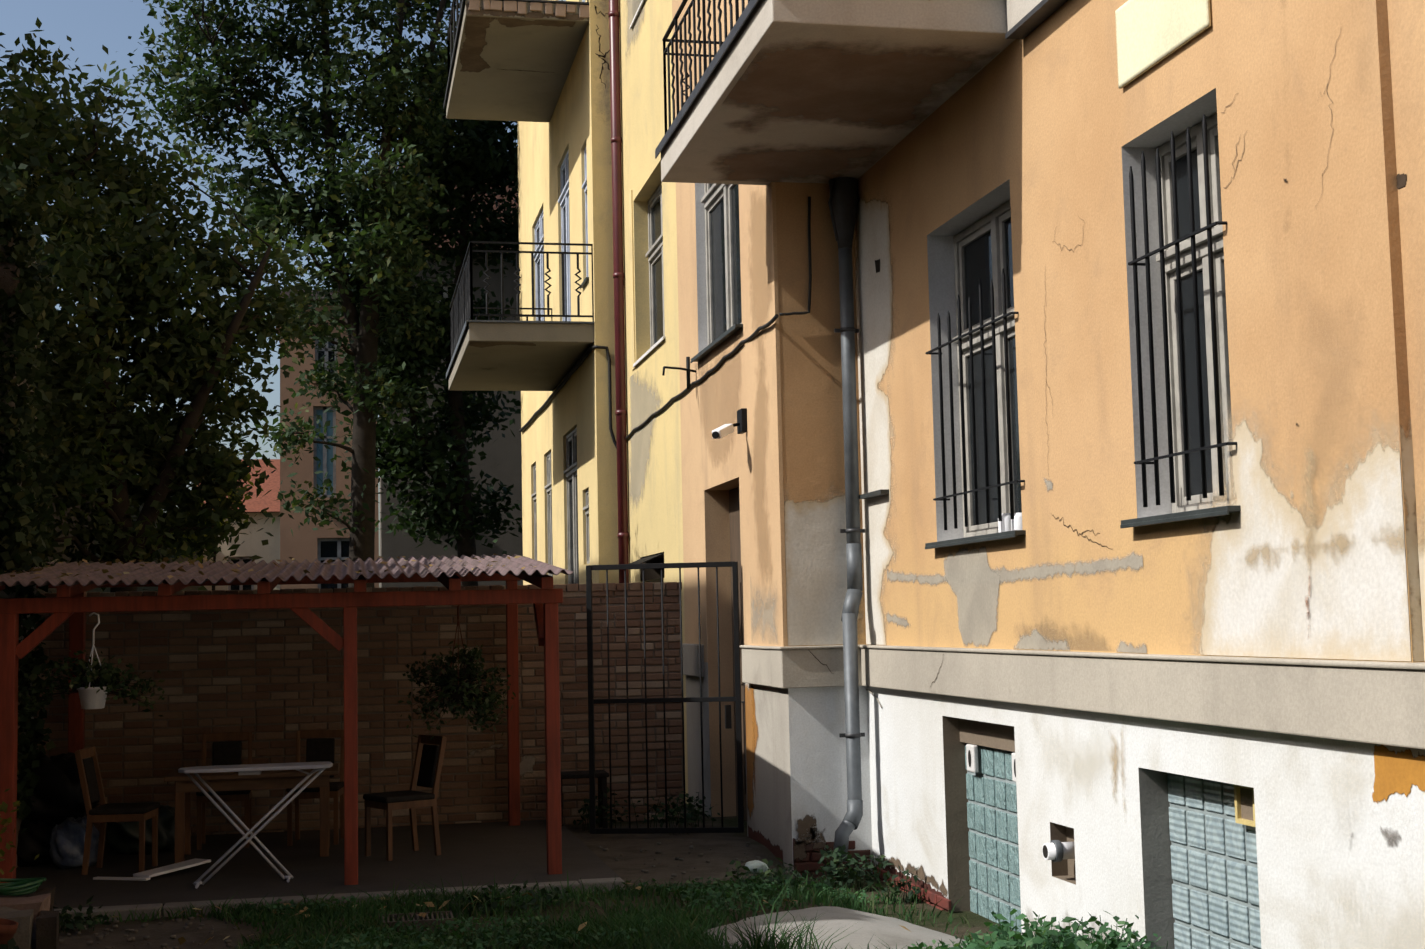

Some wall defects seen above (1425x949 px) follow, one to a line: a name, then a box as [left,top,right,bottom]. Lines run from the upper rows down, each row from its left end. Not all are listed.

crack [1221,93,1247,189]
peeling [784,198,895,646]
peeling [1195,418,1425,661]
peeling [1372,745,1425,803]
spalling [748,815,951,912]